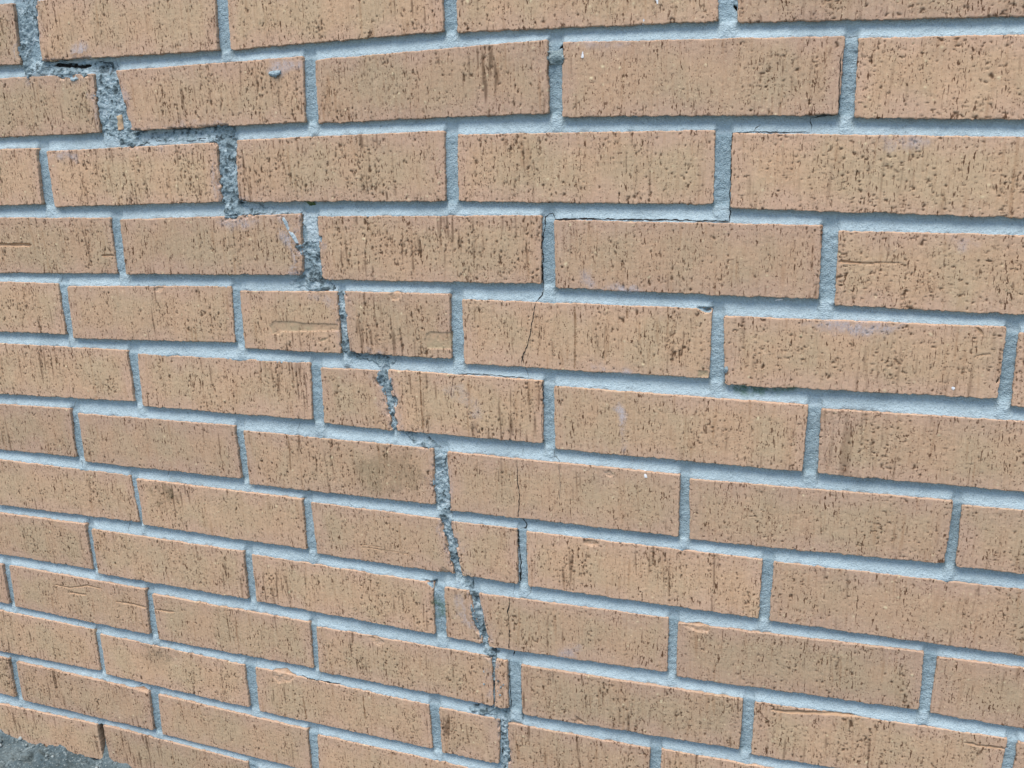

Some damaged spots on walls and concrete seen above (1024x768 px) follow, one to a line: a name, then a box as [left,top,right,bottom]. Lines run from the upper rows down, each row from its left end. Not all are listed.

crack [18,0,531,768]
crack [463,36,855,499]